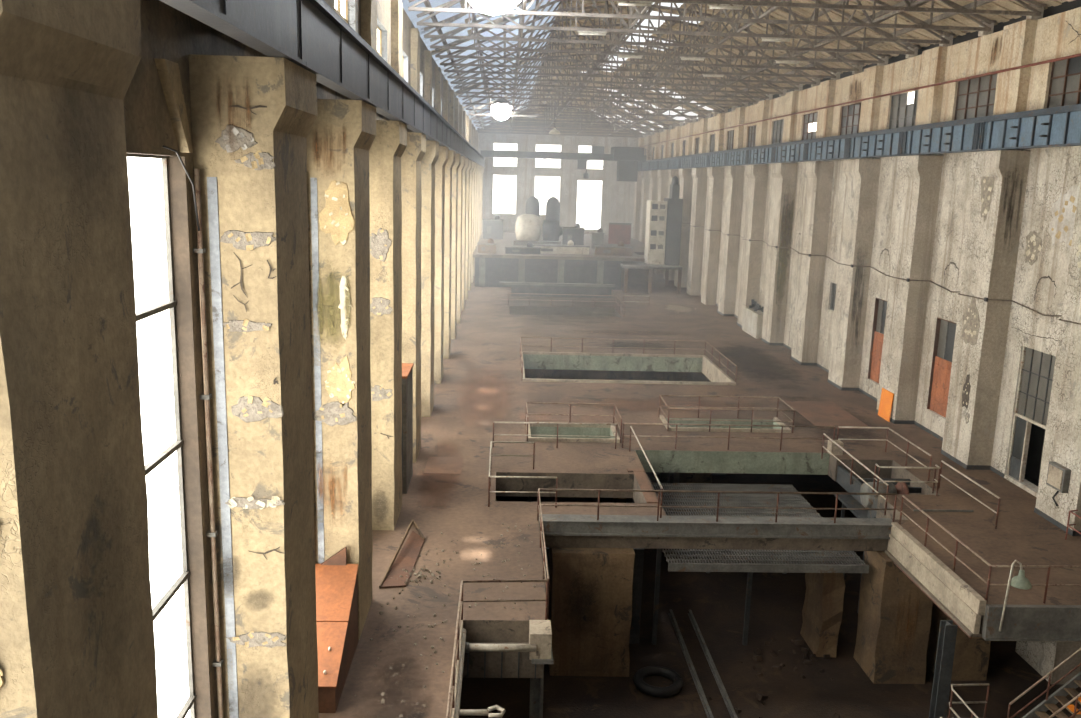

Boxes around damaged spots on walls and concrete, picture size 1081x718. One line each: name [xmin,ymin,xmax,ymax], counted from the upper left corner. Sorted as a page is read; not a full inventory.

crack [229,105,267,115]
peeling [215,125,276,170]
peeling [319,180,356,245]
spalling [219,230,276,251]
spalling [370,228,392,262]
crack [231,252,277,312]
water stain [318,275,350,339]
spalling [231,395,284,423]
spalling [225,496,285,509]